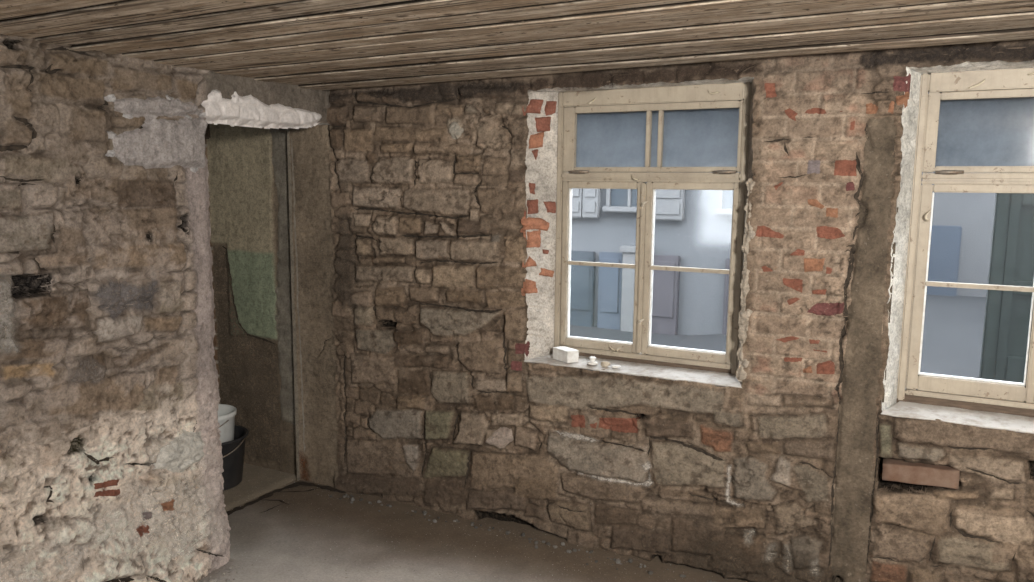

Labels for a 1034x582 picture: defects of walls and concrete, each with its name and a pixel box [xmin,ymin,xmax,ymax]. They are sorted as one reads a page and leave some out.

flaking render [522,99,557,160]
flaking render [520,183,556,296]
crack [799,123,869,565]
crack [83,452,157,494]
crack [105,574,166,582]